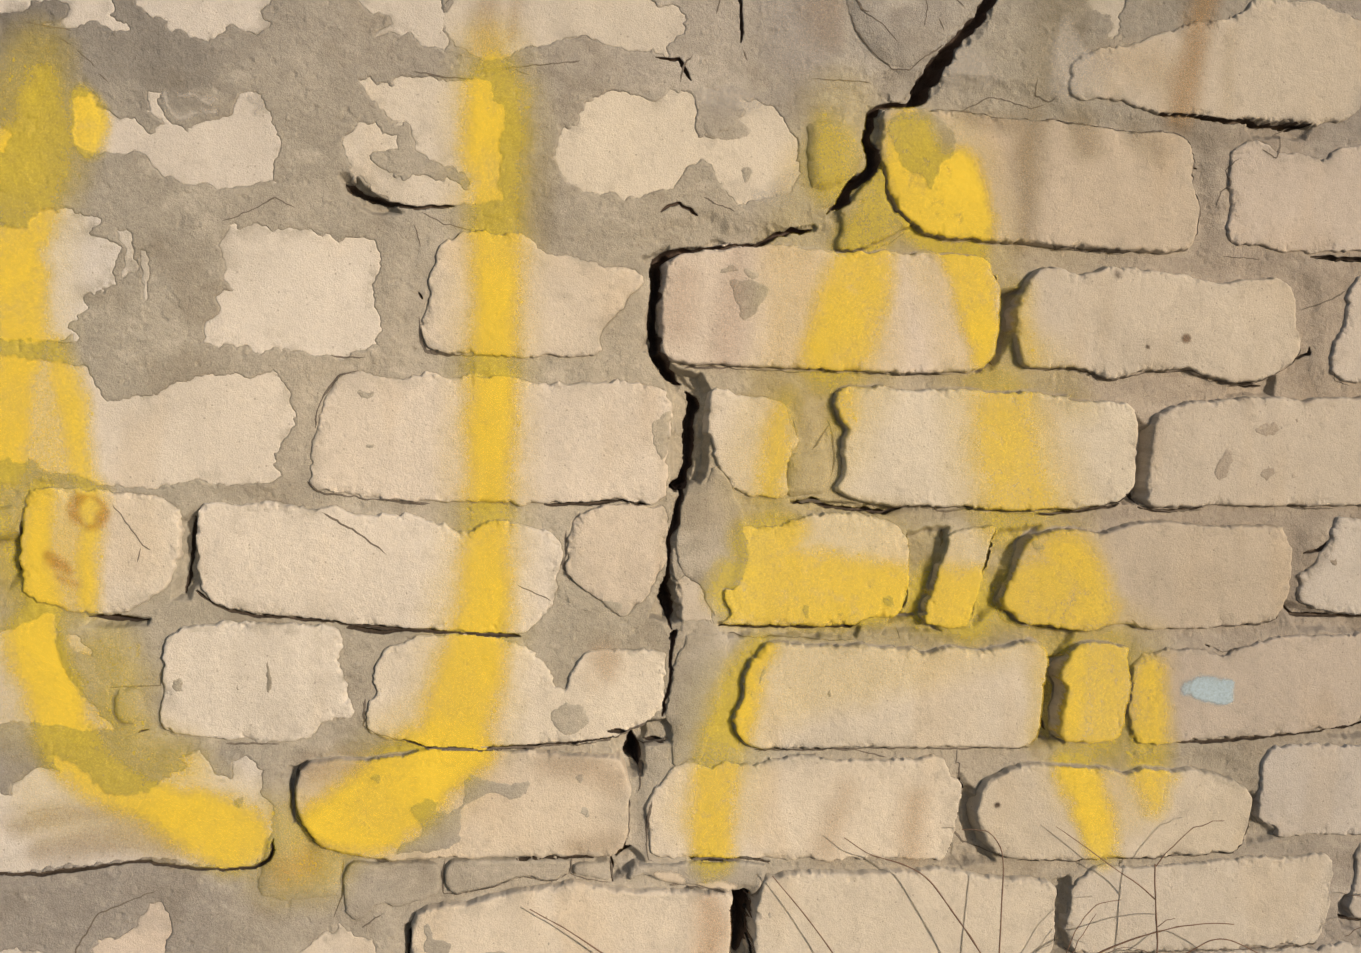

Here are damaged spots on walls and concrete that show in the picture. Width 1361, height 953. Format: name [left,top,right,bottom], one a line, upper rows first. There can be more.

peeling [0,0,130,31]
peeling [135,0,271,42]
crack [964,77,1059,110]
peeling [92,91,281,190]
peeling [342,76,496,209]
peeling [552,90,801,205]
crack [647,0,996,716]
crack [623,730,641,765]
crack [644,802,652,861]
crack [442,856,613,895]
peeling [93,902,172,953]
crack [729,888,749,951]